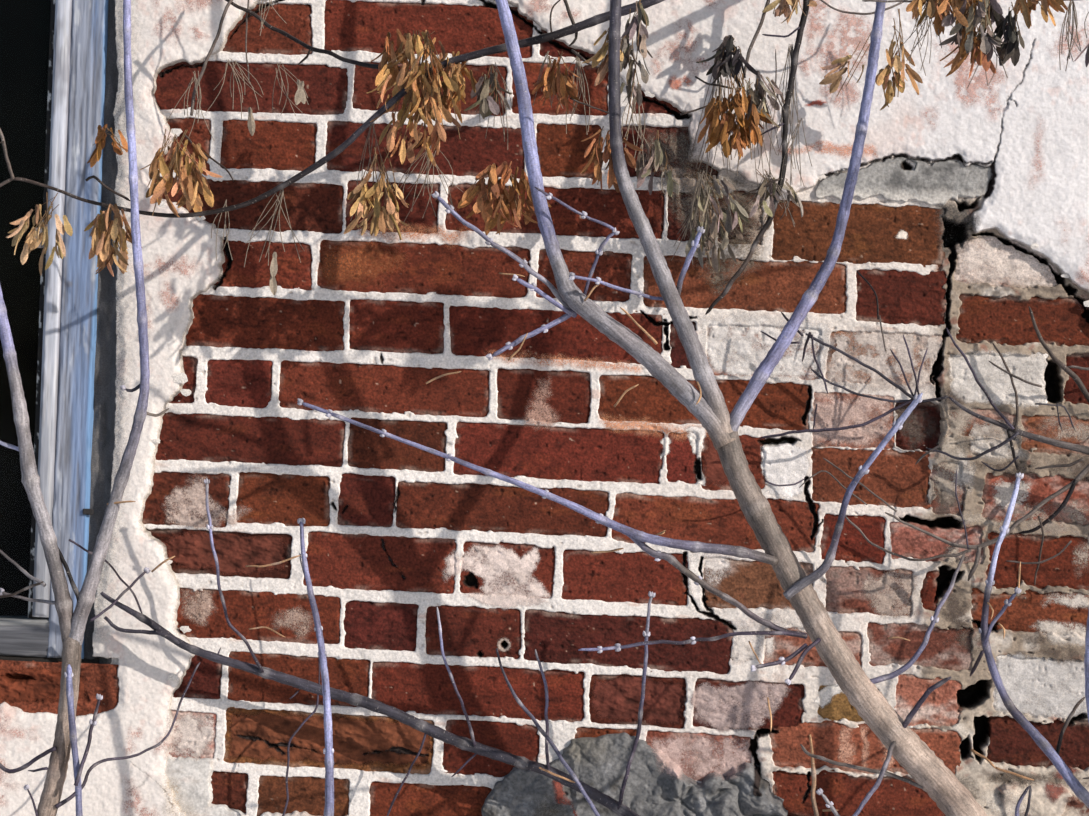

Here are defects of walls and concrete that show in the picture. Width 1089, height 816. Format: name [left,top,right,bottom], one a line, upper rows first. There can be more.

spalling [149,0,261,155]
crack [956,99,1016,198]
spalling [686,426,728,485]
spalling [758,436,799,446]
spalling [137,199,286,816]
crack [804,476,823,540]
peeling [444,546,550,609]
crack [681,551,736,630]
spalling [935,565,996,651]
spalling [228,711,432,765]
spalling [592,674,685,724]
spalling [956,680,989,762]